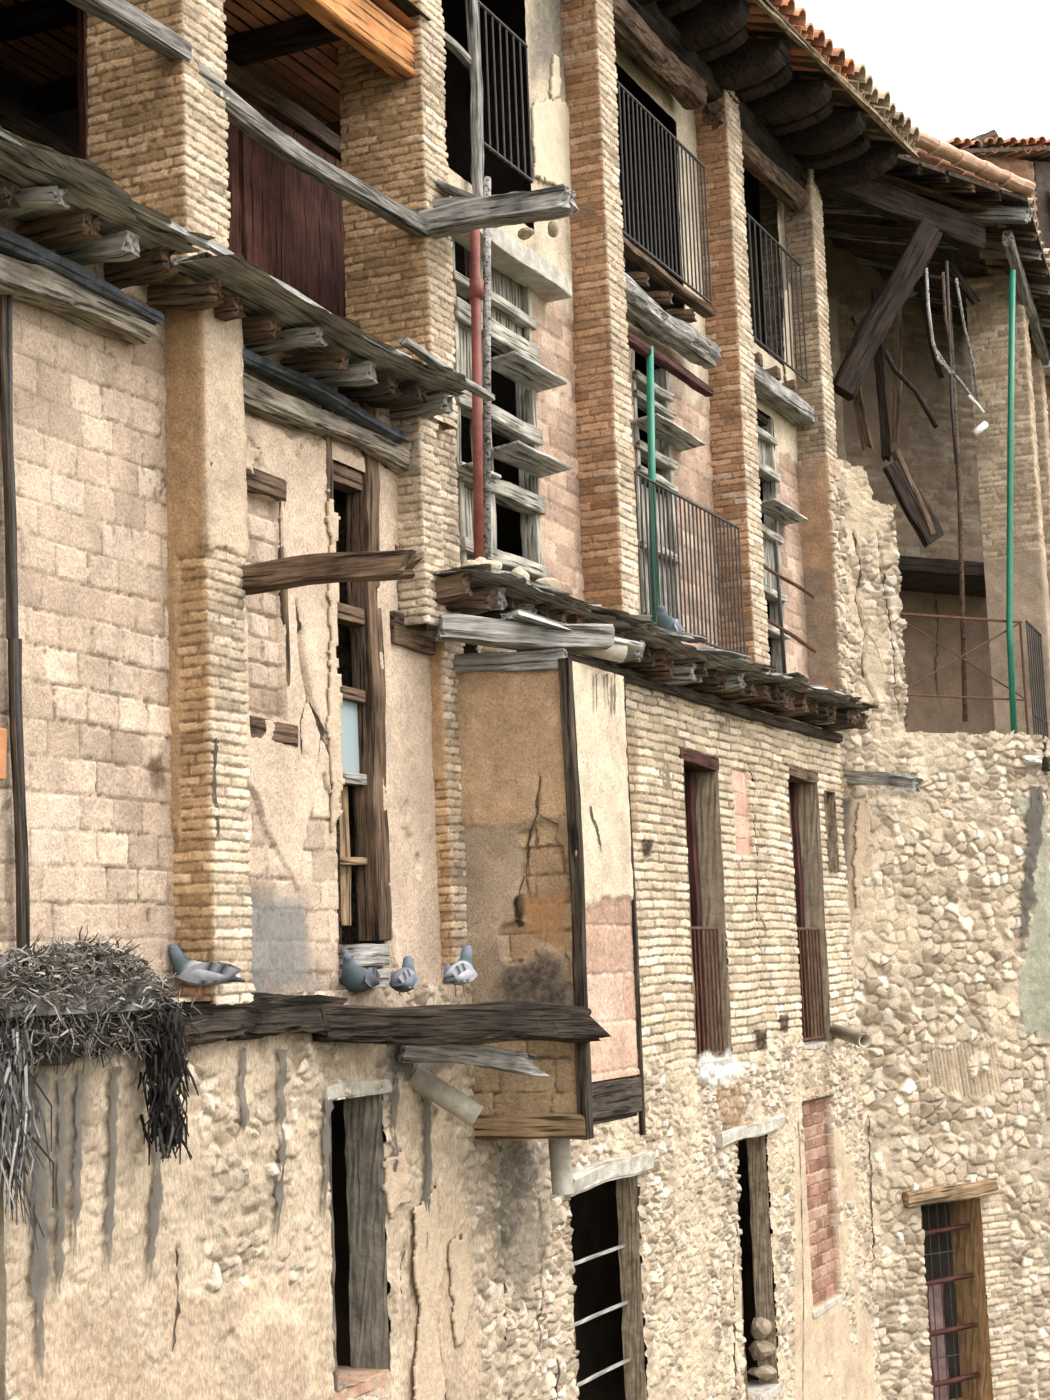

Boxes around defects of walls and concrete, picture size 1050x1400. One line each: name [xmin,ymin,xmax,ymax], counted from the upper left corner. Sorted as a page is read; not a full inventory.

damp [30,1070,83,1372]
damp [106,1066,123,1267]
damp [149,1135,163,1278]
damp [239,1047,250,1131]
damp [275,1049,288,1243]
damp [323,1098,334,1211]
damp [423,1097,433,1213]
damp [700,1053,743,1086]